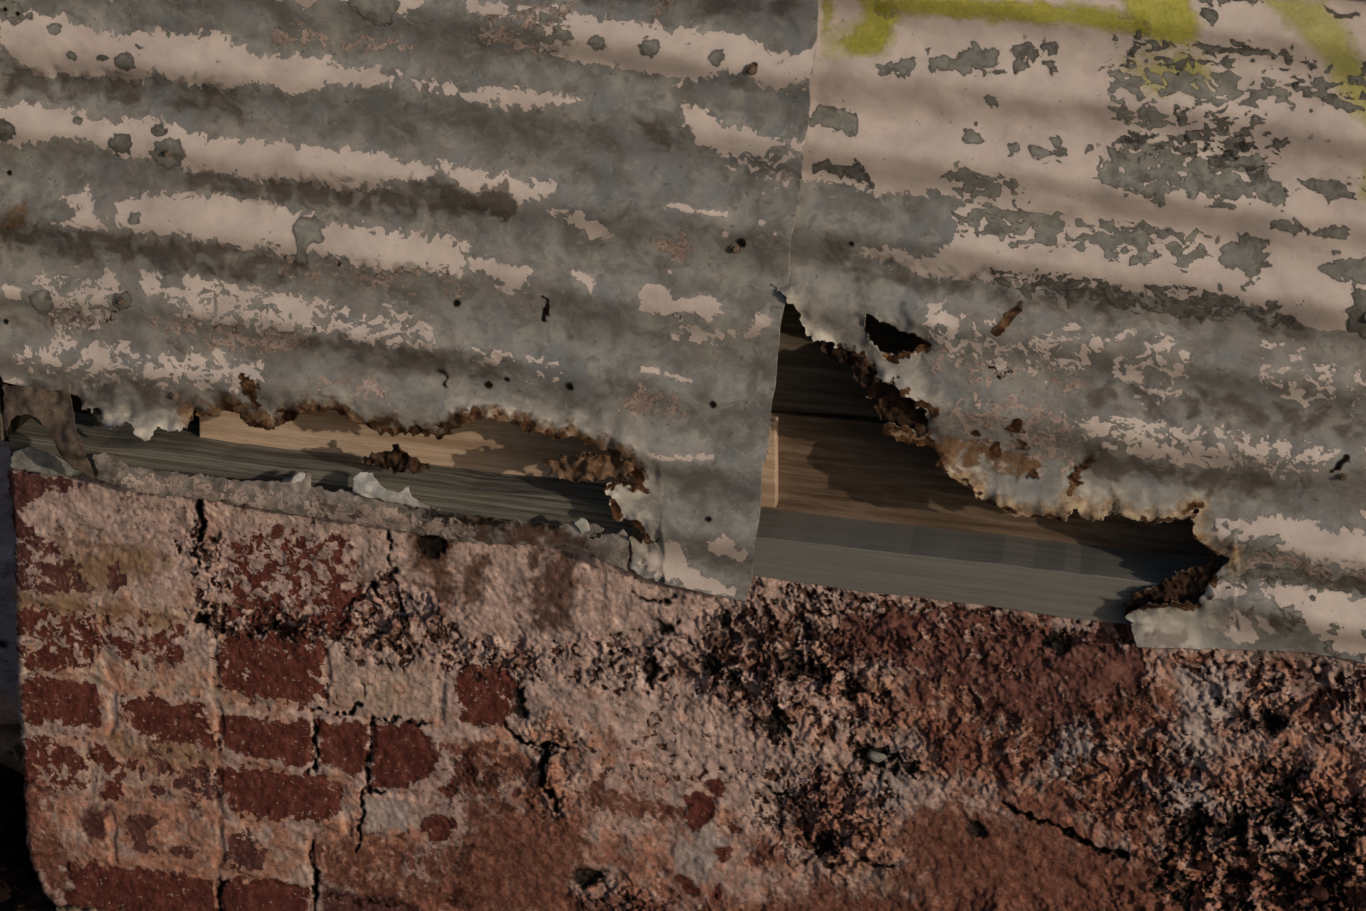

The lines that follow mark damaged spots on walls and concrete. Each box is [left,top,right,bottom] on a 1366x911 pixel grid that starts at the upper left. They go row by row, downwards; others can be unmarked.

peeling [0,0,585,113]
peeling [0,99,615,395]
peeling [465,0,1366,481]
corrosion [177,373,660,545]
corrosion [801,326,1099,521]
corrosion [1100,502,1233,618]
crack [307,682,430,852]
crack [504,723,582,812]
damp [848,738,924,820]
damp [1033,720,1094,791]
crack [1002,801,1129,860]
damp [1138,585,1366,911]